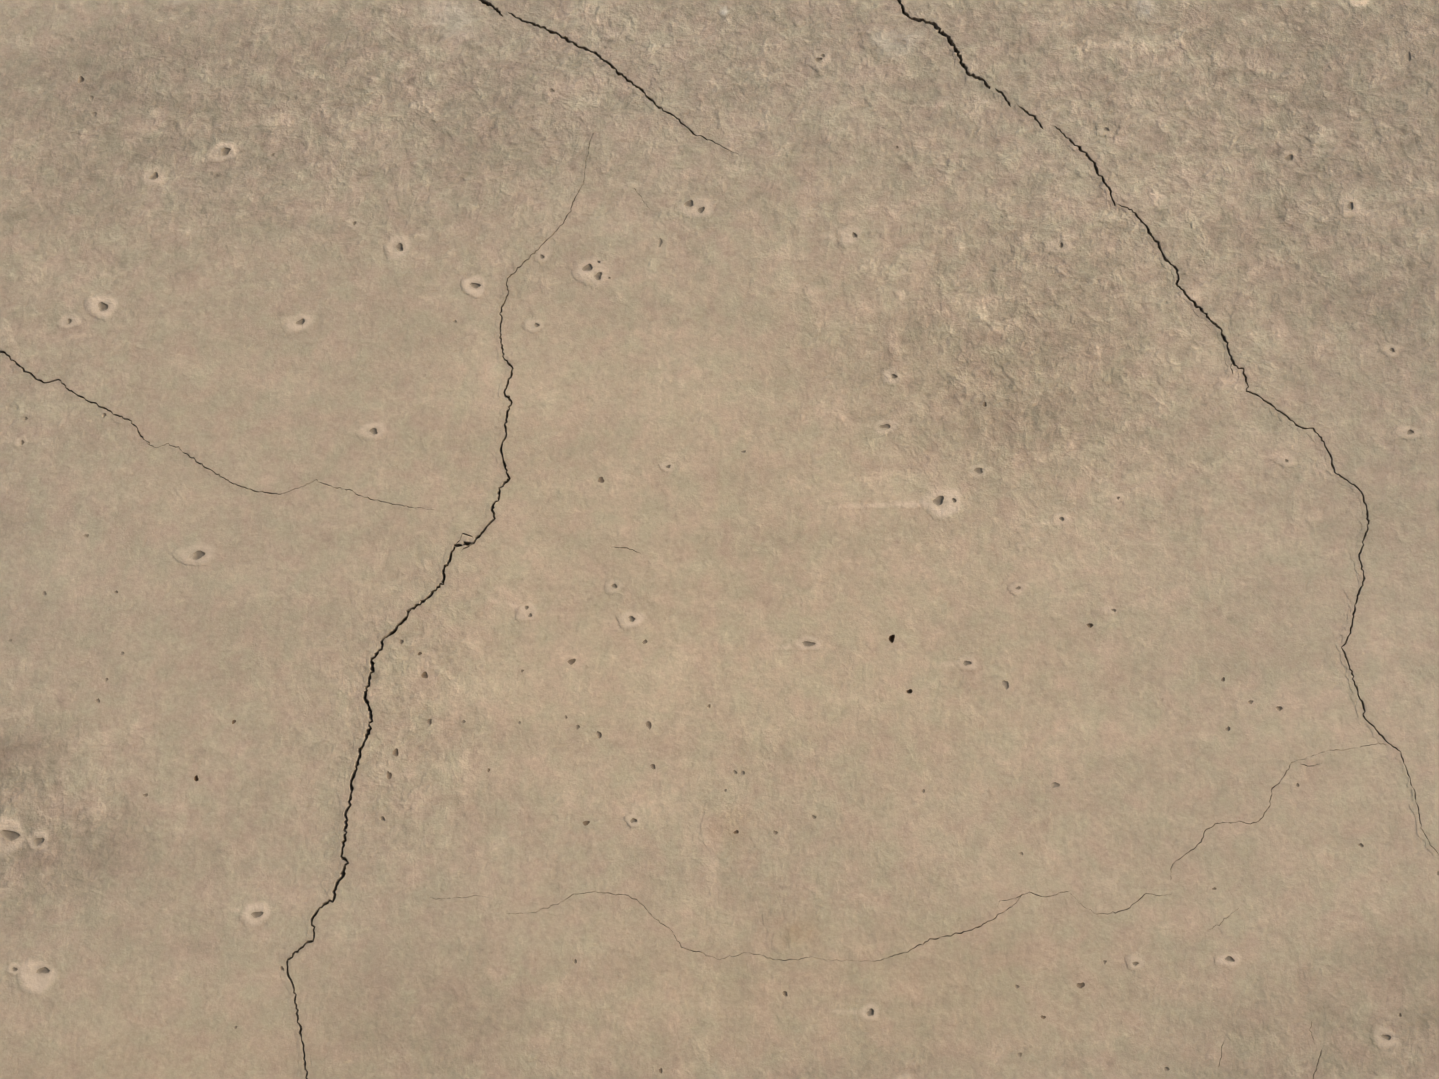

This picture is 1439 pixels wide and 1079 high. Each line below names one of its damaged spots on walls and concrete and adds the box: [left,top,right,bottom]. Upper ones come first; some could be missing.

crack [0,132,597,1079]
crack [430,0,1439,962]